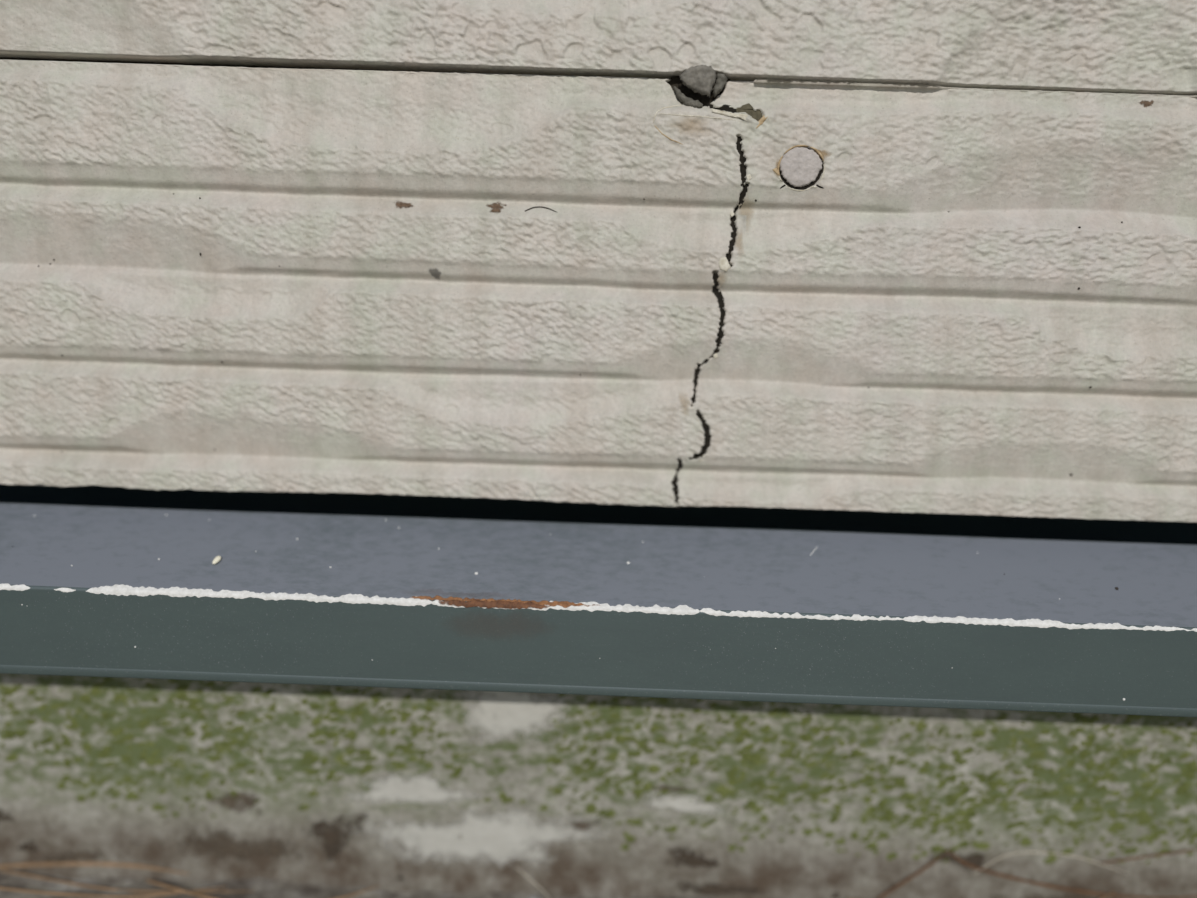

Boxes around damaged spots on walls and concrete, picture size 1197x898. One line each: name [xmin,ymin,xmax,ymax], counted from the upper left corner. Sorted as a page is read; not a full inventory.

spalling [653,65,768,144]
crack [671,136,752,509]
rust [412,595,595,609]
damp [219,792,259,813]
damp [177,831,300,857]
damp [302,814,366,859]
damp [572,821,598,830]
damp [670,848,756,896]
damp [931,850,984,868]